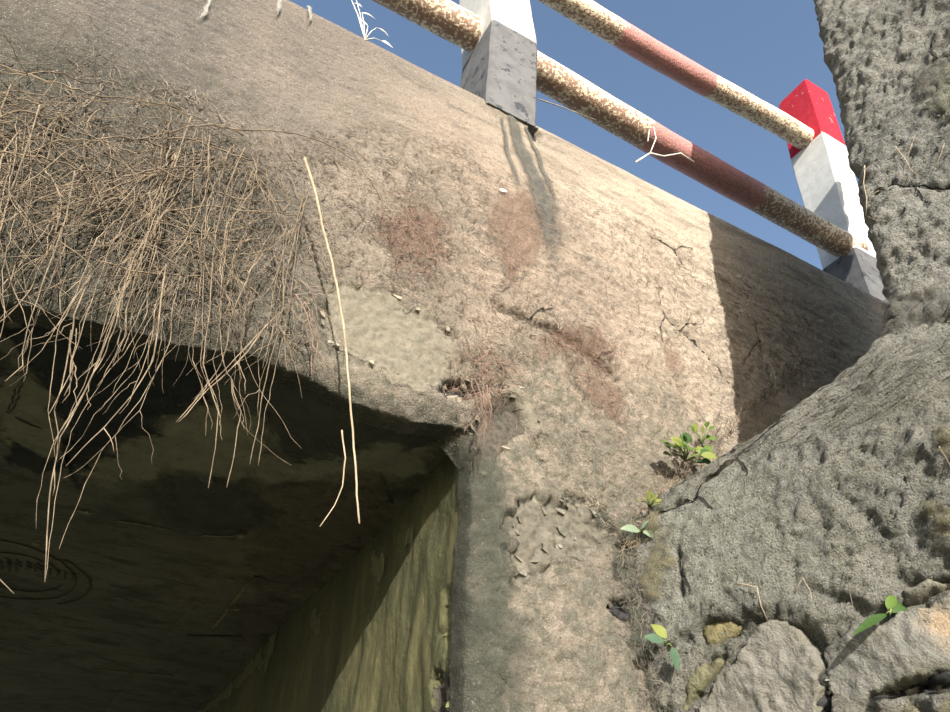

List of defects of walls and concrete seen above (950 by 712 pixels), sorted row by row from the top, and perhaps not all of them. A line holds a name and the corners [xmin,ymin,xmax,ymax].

crack [875,184,950,204]
crack [492,307,612,366]
water stain [150,471,272,539]